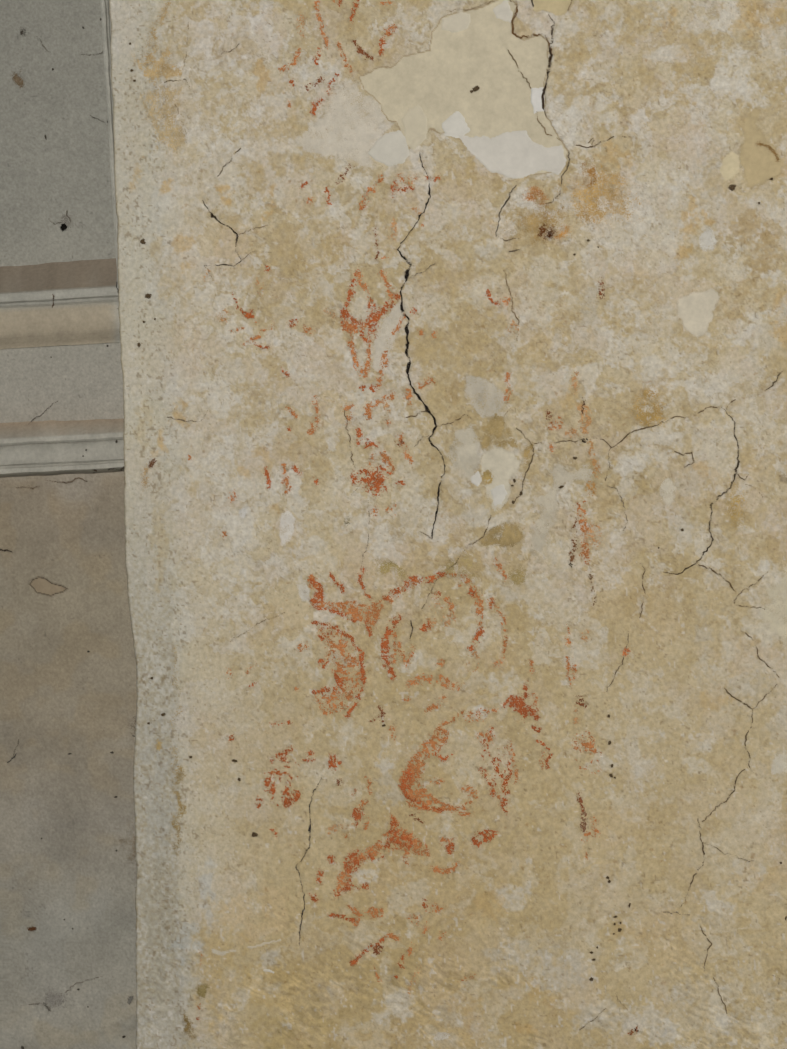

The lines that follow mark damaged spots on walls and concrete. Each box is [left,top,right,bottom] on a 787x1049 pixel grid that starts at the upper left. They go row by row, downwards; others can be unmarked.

spalling [359,0,575,179]
crack [397,154,468,538]
crack [410,517,491,639]
peeling [445,375,522,512]
crack [504,399,768,692]
crack [669,632,780,1014]